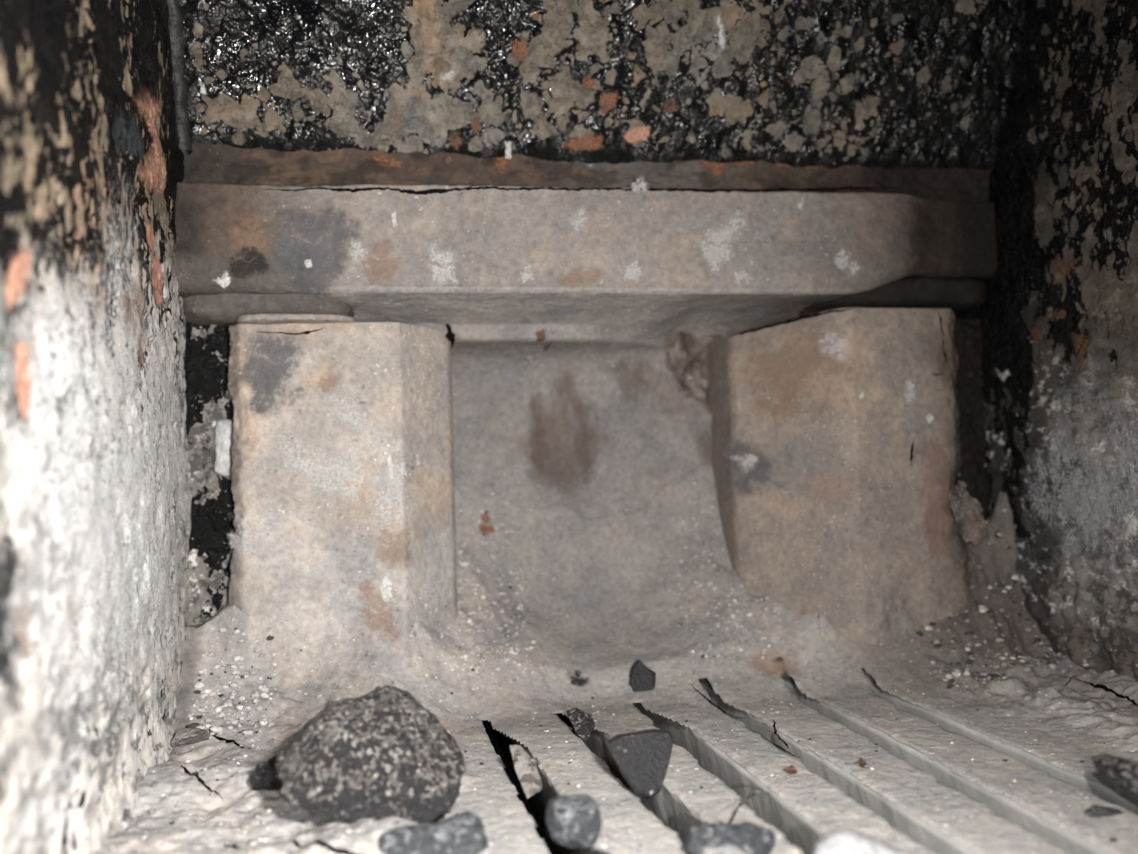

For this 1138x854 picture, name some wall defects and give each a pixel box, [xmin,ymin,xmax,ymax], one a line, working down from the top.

corrosion [137,98,167,193]
crack [269,184,909,195]
corrosion [5,247,32,307]
corrosion [145,223,165,309]
corrosion [15,338,32,424]
crack [445,324,455,366]